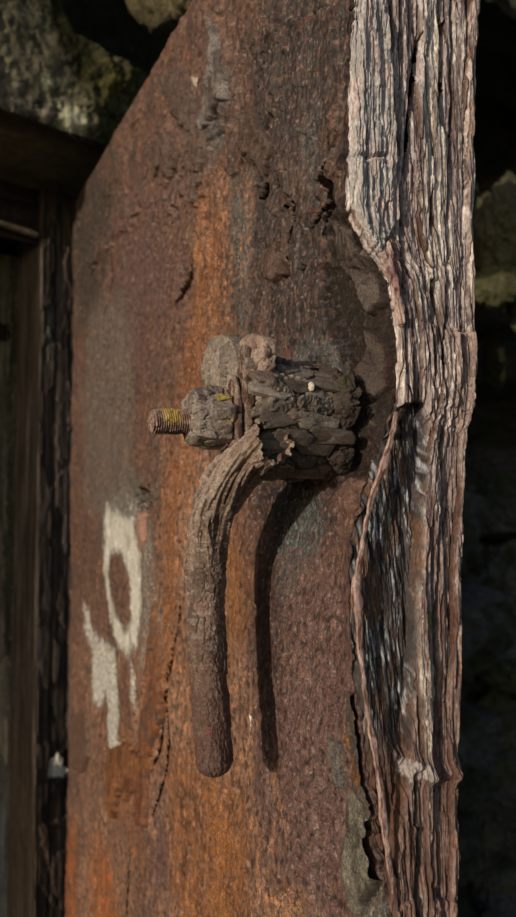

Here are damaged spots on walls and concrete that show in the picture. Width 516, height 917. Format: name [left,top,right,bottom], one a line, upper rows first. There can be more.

crack [404,0,452,181]
rust [178,197,233,409]
crack [434,326,445,373]
rust [69,709,91,773]
rust [105,445,194,828]
crack [152,605,181,816]